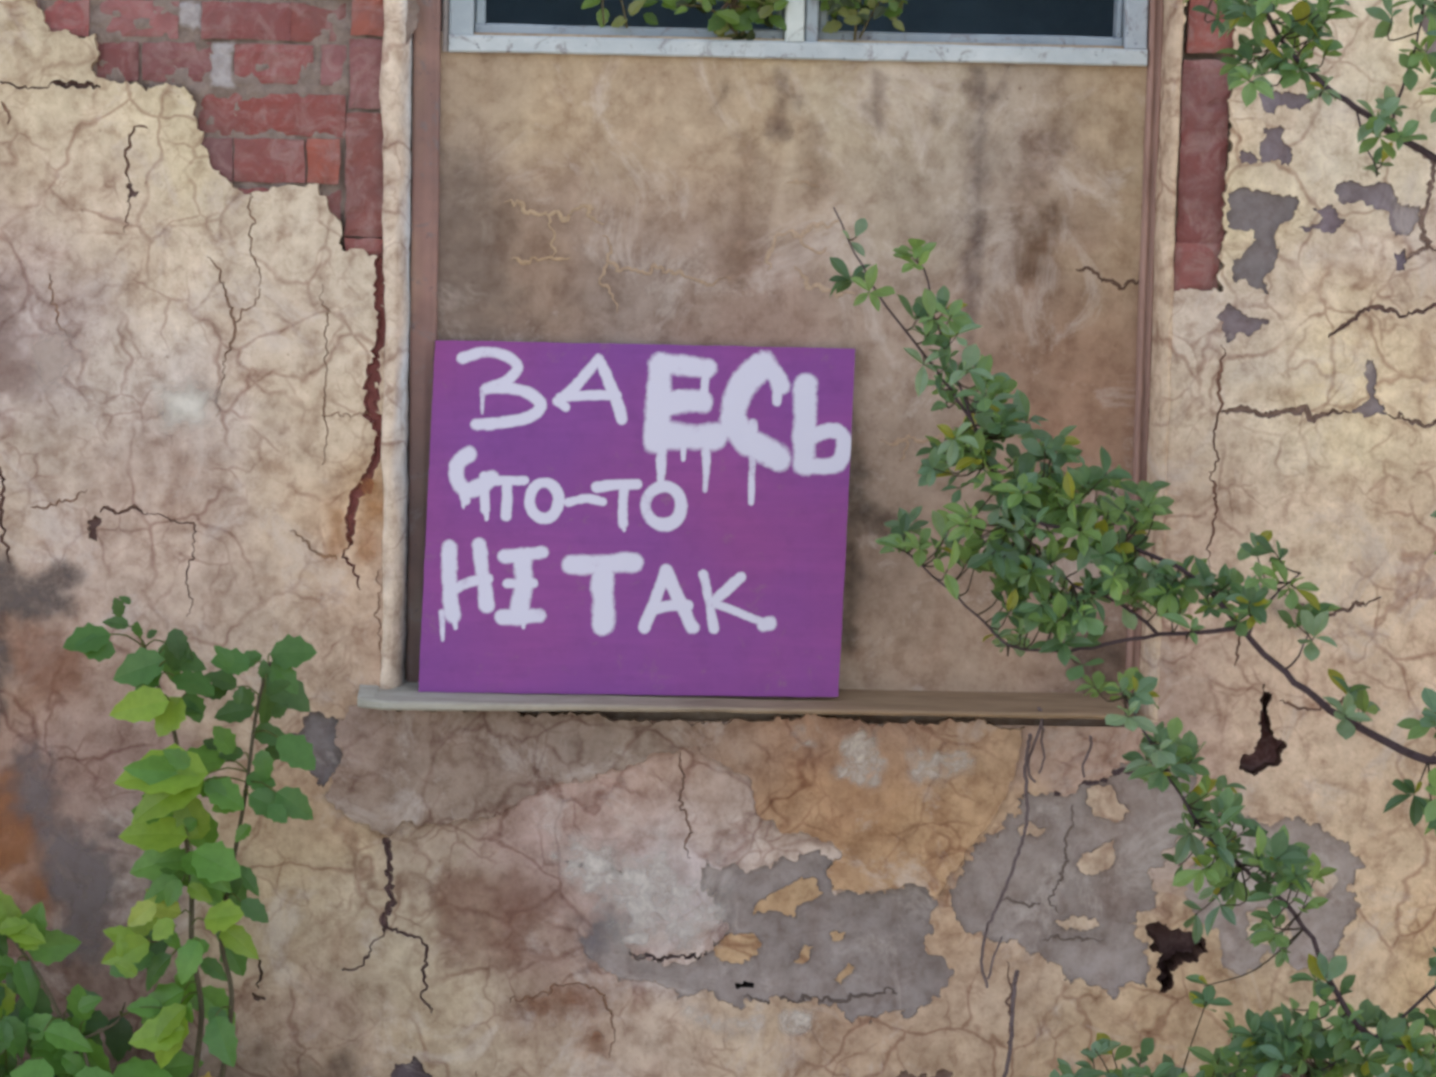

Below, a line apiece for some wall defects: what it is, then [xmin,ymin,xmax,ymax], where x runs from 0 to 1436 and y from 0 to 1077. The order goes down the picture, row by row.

crack [0,79,101,124]
flaking render [34,0,384,259]
flaking render [1159,0,1421,343]
crack [290,253,386,670]
spalling [1350,359,1388,418]
crack [1328,303,1436,338]
crack [0,467,197,616]
water stain [0,561,77,683]
spalling [1239,683,1287,776]
crack [342,837,433,1013]
flaking render [291,705,1366,1026]
spalling [390,1056,433,1077]